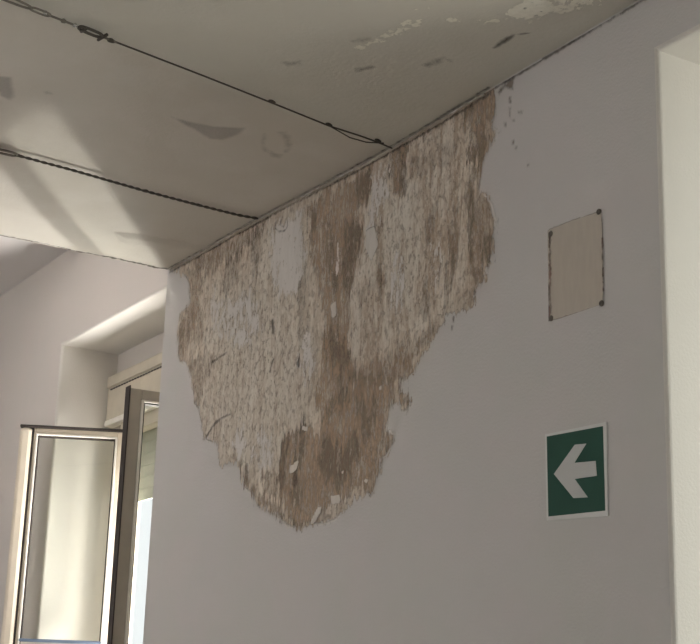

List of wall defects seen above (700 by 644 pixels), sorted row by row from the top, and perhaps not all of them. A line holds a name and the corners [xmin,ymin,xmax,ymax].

peeling [477,0,602,25]
peeling [173,80,513,532]